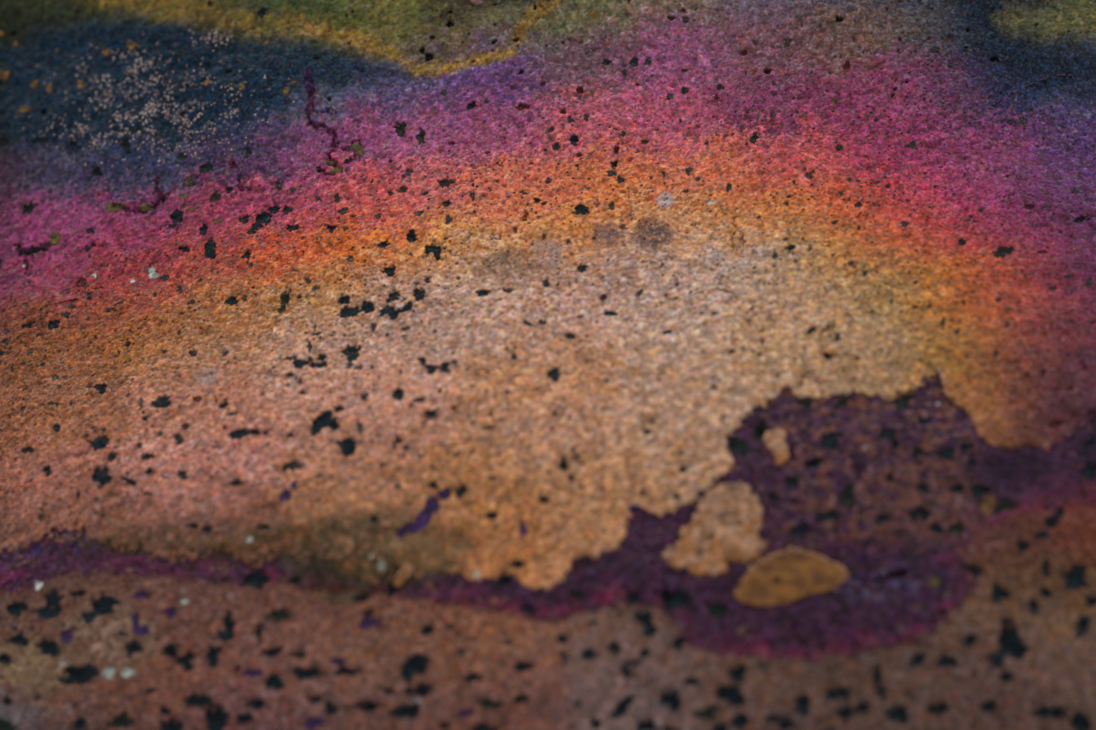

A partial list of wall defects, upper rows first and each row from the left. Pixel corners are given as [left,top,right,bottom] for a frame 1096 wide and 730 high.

spalling [704,28,979,251]